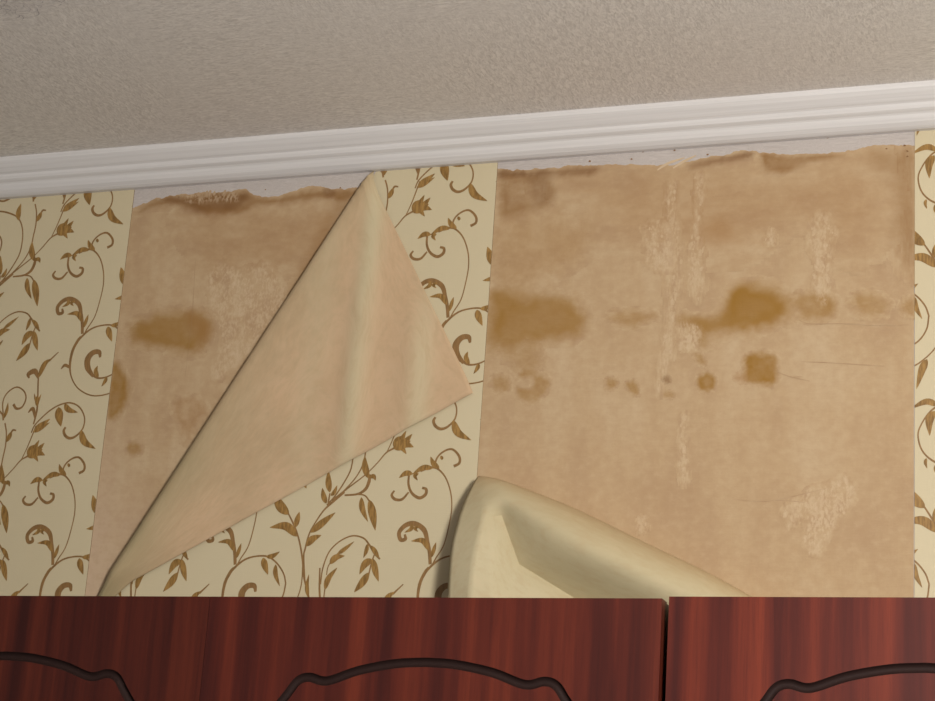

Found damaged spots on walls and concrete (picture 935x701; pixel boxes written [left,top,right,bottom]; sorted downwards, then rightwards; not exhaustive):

spalling [497,132,914,171]
leakage [485,145,915,407]
leakage [122,304,217,361]
leakage [106,357,135,424]
peeling [477,237,914,597]